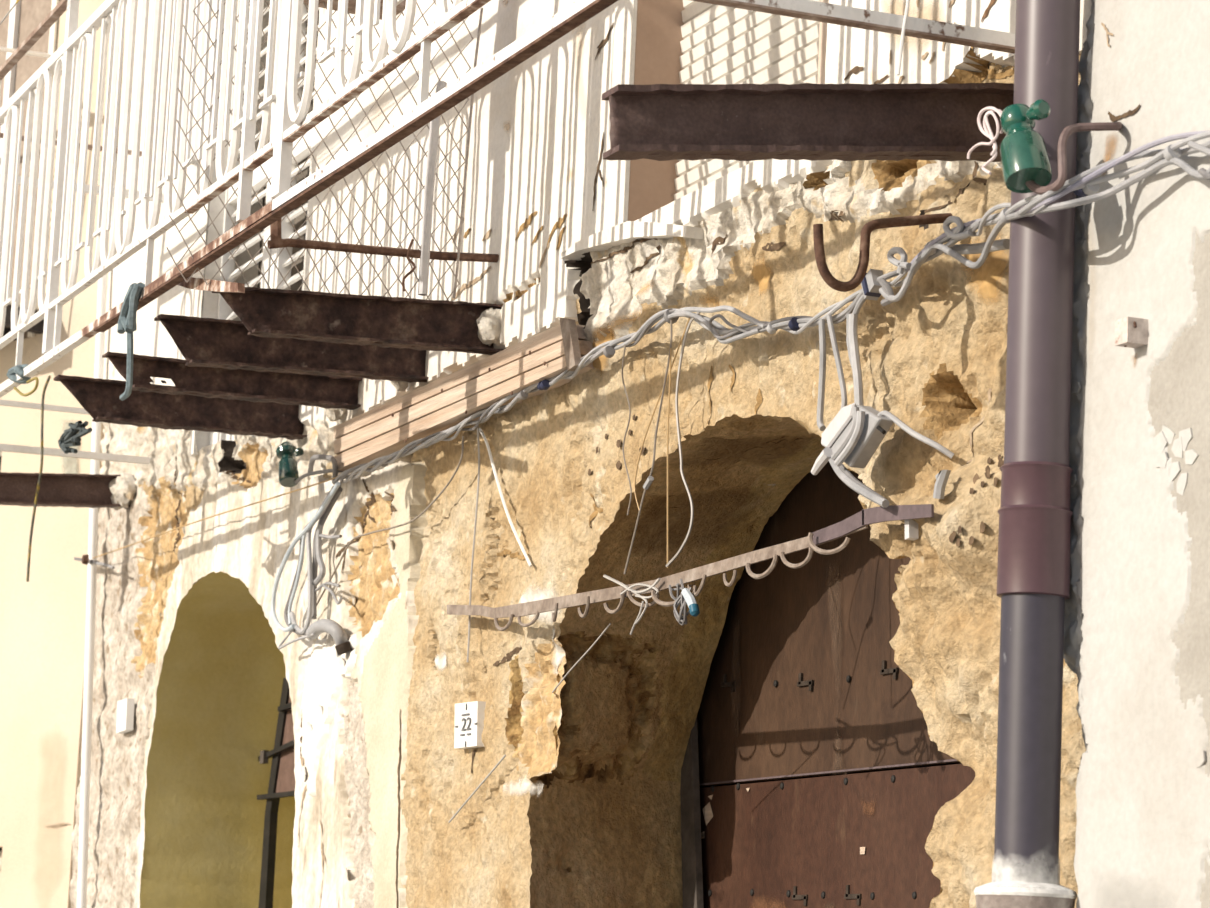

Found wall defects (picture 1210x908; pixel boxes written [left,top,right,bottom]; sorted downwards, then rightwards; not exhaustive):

flaking render [1076,0,1095,175]
flaking render [495,211,567,305]
spalling [802,171,830,191]
spalling [871,159,932,192]
flaking render [131,476,189,678]
spalling [478,505,505,608]
spalling [919,363,983,440]
spalling [969,454,1004,494]
flaking render [1064,195,1092,751]
peeling [1148,232,1210,777]
flaking render [301,493,400,908]
spalling [493,631,661,788]